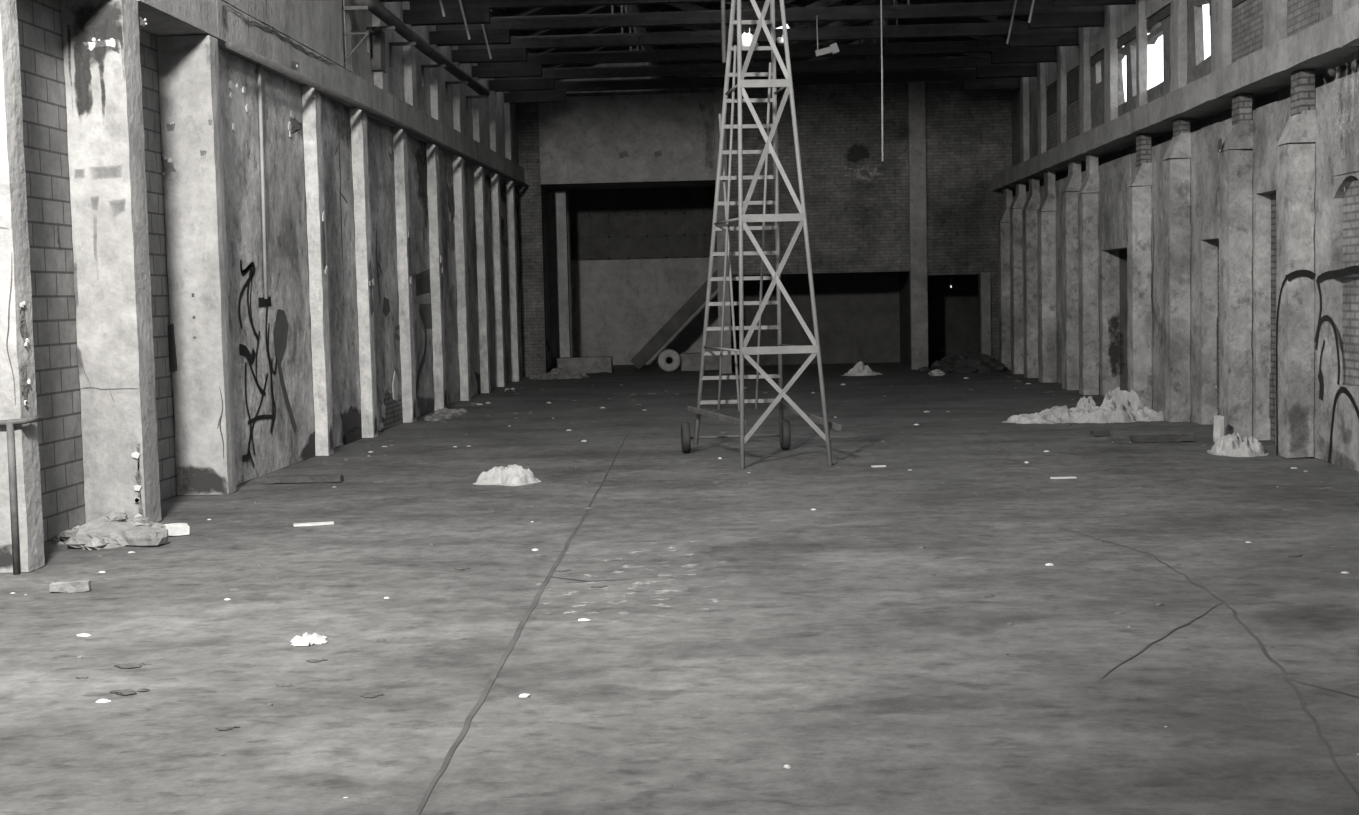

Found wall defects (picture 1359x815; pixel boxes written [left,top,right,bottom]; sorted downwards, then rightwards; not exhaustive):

damp [67,29,105,115]
crack [414,433,629,815]
crack [1059,527,1359,797]